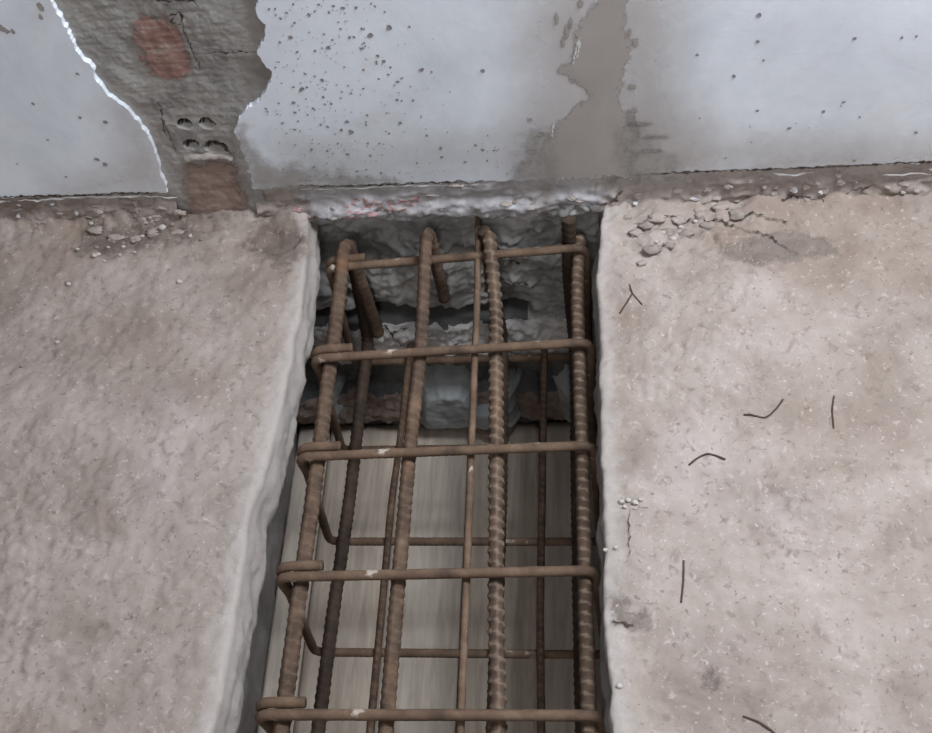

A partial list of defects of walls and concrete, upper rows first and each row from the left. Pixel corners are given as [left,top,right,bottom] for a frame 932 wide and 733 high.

spalling [267,0,376,59]
spalling [264,71,364,134]
crack [638,160,932,254]